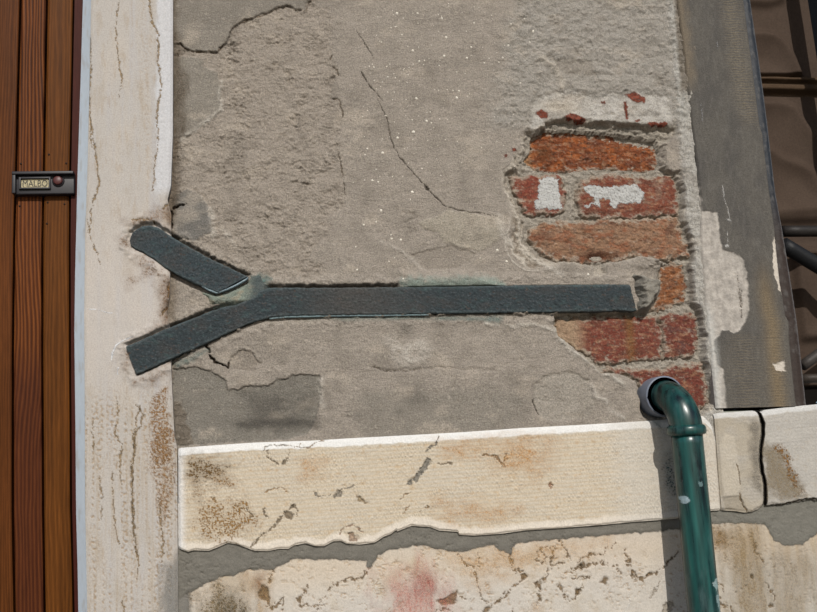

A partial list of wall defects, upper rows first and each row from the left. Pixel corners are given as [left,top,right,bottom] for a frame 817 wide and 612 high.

crack [115,4,123,97]
crack [180,7,285,54]
crack [87,42,100,262]
spalling [168,0,346,280]
crack [361,72,491,216]
spalling [501,90,750,420]
crack [99,398,144,574]
water stain [150,427,175,508]
crack [258,570,367,610]
crack [436,540,678,612]
crack [750,533,775,607]